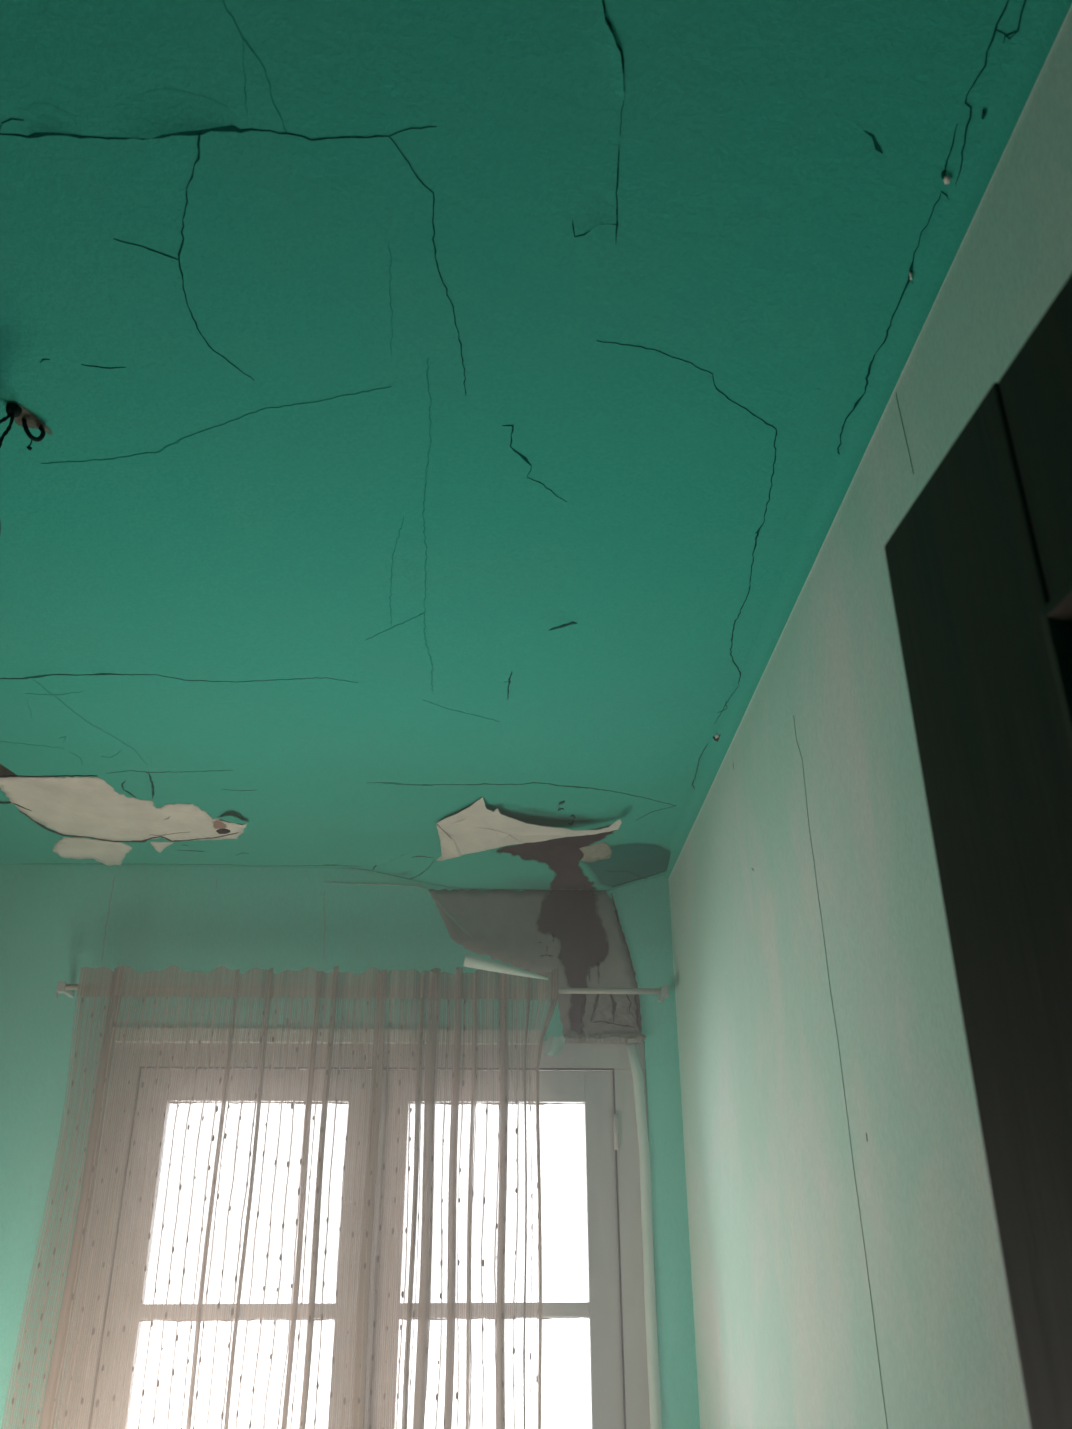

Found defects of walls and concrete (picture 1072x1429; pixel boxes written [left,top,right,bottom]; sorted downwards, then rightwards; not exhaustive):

crack [564,0,625,239]
crack [837,0,1026,474]
crack [0,1,512,722]
crack [376,340,777,820]
spalling [0,775,249,866]
crack [0,662,358,799]
flaking render [436,797,622,863]
leakage [497,825,616,1035]
crack [793,716,888,1429]